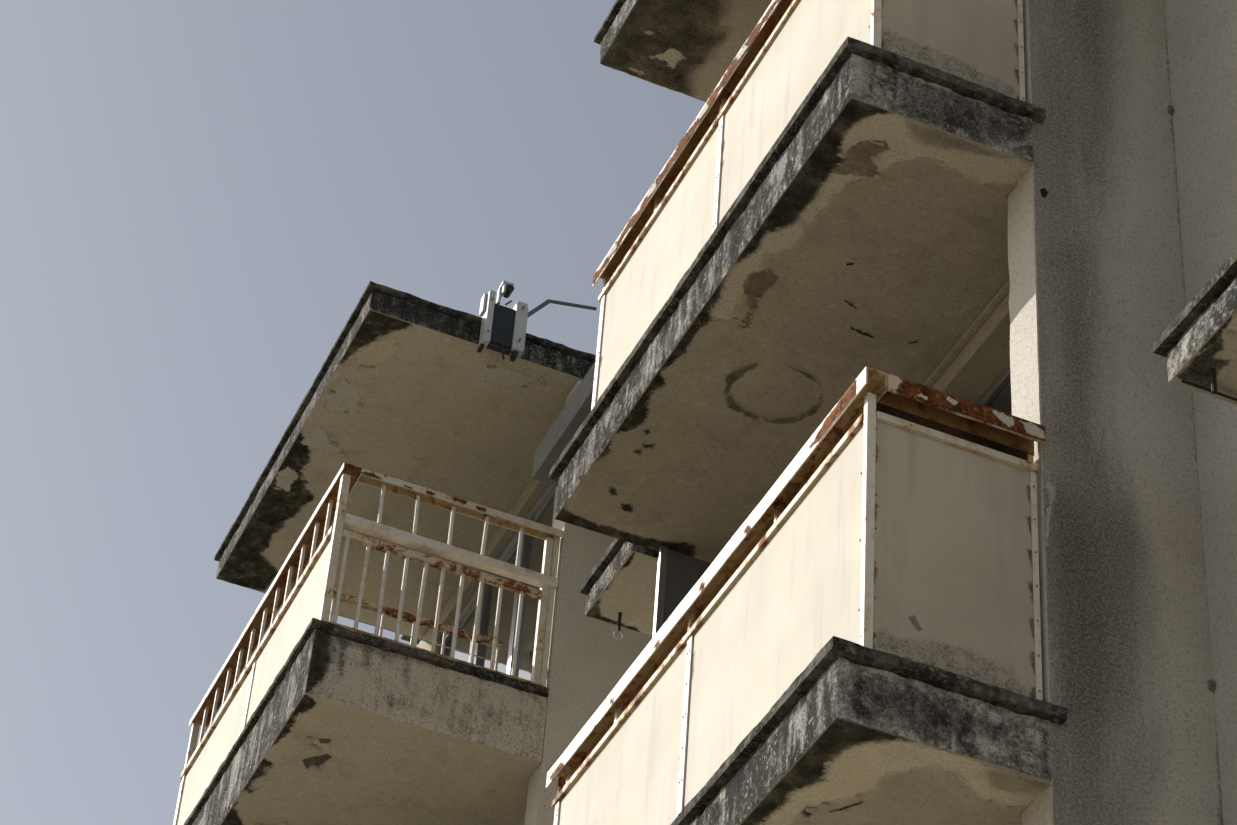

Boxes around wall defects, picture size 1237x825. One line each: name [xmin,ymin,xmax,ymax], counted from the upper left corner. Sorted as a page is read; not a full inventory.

corrosion [592,0,778,285]
water stain [341,294,476,362]
water stain [1176,312,1236,388]
corrosion [809,379,856,448]
water stain [596,0,1126,825]
corrosion [895,381,1046,442]
corrosion [348,464,387,479]
water stain [217,432,314,592]
water stain [556,506,695,570]
water stain [244,630,402,793]
water stain [197,790,242,825]